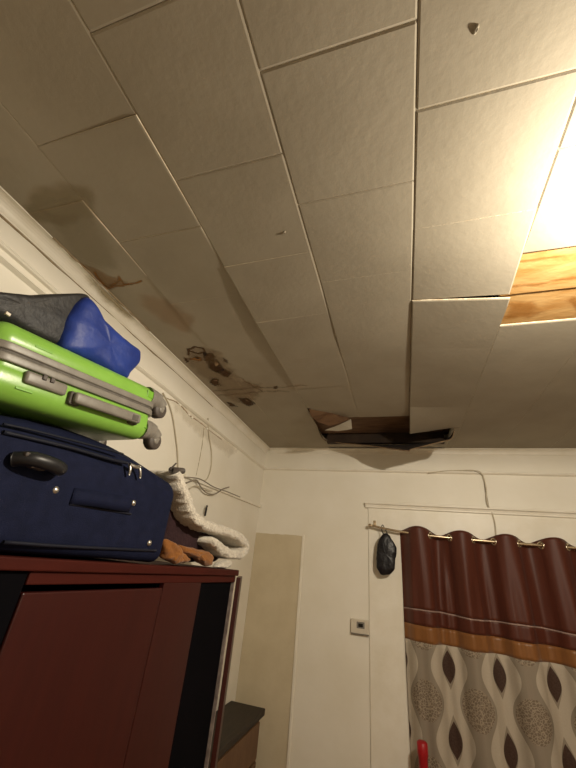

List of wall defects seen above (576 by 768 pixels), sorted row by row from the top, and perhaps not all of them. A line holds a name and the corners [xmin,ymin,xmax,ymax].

water stain [185,346,231,386]